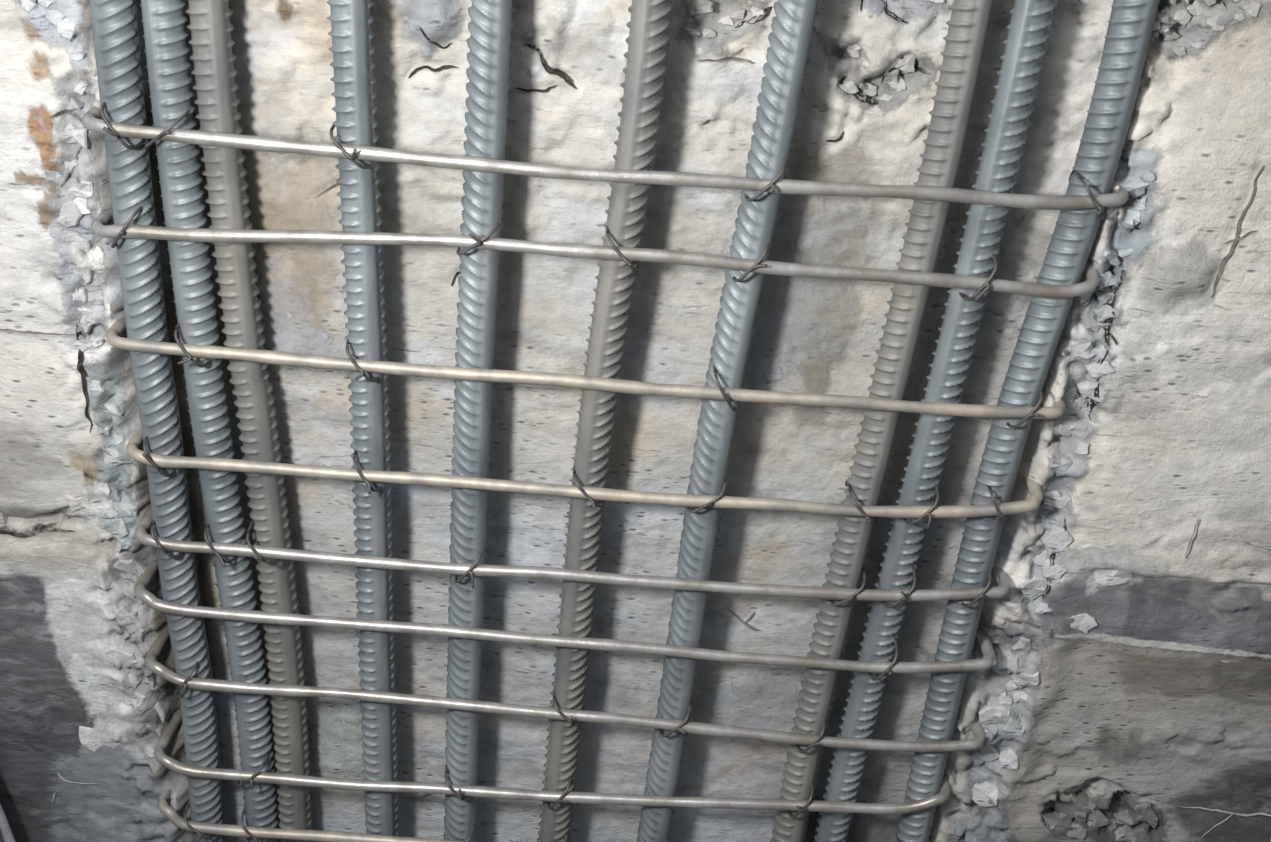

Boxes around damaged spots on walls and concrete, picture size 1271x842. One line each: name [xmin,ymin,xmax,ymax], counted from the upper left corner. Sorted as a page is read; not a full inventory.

corrosion [22,21,49,79]
crack [408,27,459,79]
crack [516,44,577,93]
spalling [676,0,765,56]
spalling [819,36,937,112]
spalling [860,0,945,21]
corrosion [15,106,61,228]
crack [1211,166,1264,297]
spalling [0,0,177,778]
spalling [947,148,1271,842]
leakage [1042,577,1271,703]
leakage [1169,762,1271,842]